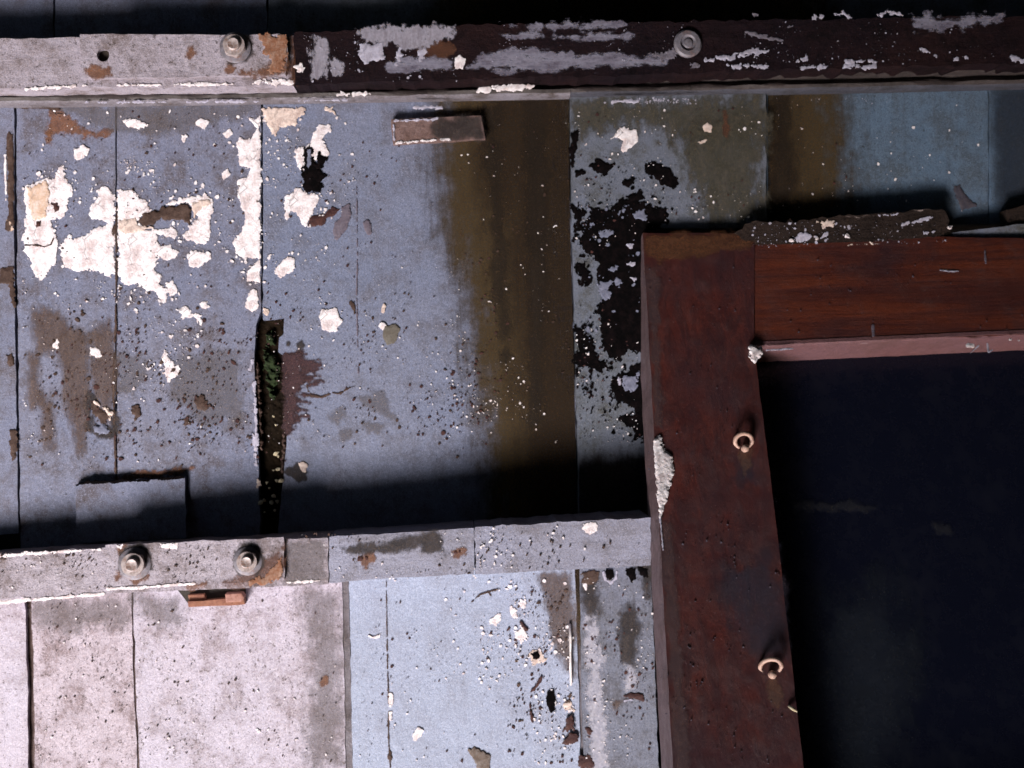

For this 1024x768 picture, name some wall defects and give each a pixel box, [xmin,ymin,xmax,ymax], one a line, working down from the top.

rust [225,32,296,86]
peeling [252,34,345,87]
peeling [356,20,678,94]
water stain [425,0,839,27]
peeling [690,25,793,70]
water stain [27,308,117,451]
peeling [21,144,214,325]
peeling [186,91,371,316]
crack [255,187,359,534]
water stain [432,99,647,520]
peeling [570,161,679,444]
peeling [489,599,593,745]